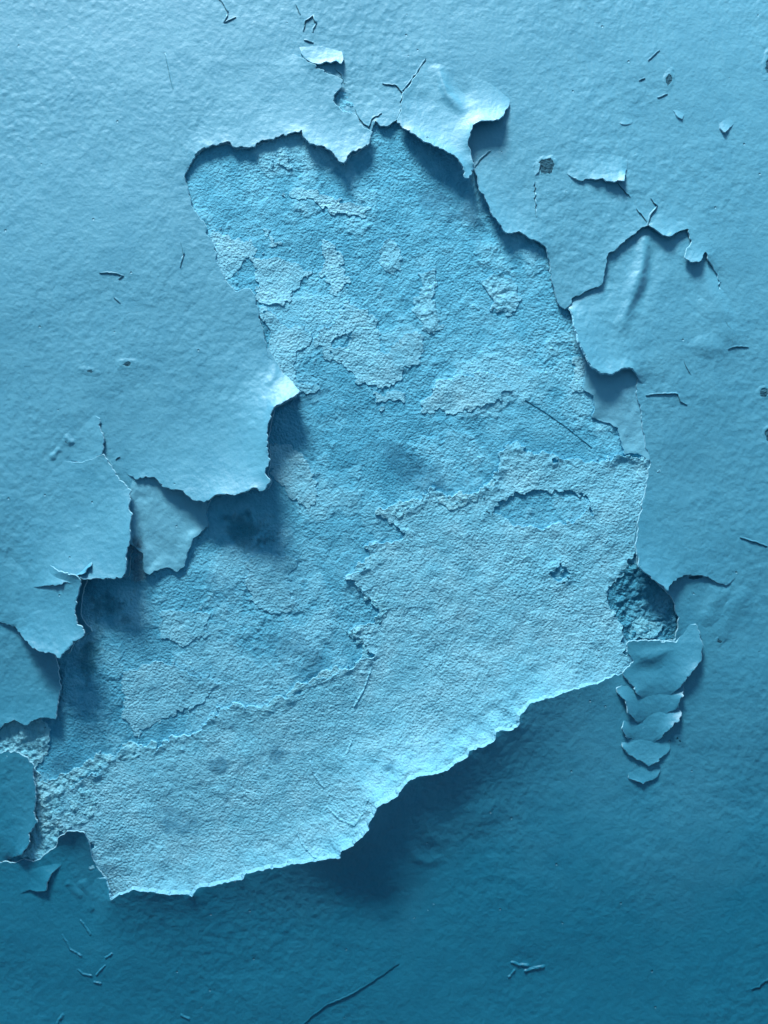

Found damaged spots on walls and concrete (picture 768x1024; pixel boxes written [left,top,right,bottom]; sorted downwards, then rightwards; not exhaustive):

crack [355,58,426,128]
peeling [0,54,734,782]
flaking render [0,718,115,862]
peeling [50,441,736,1015]
peeling [38,875,54,898]